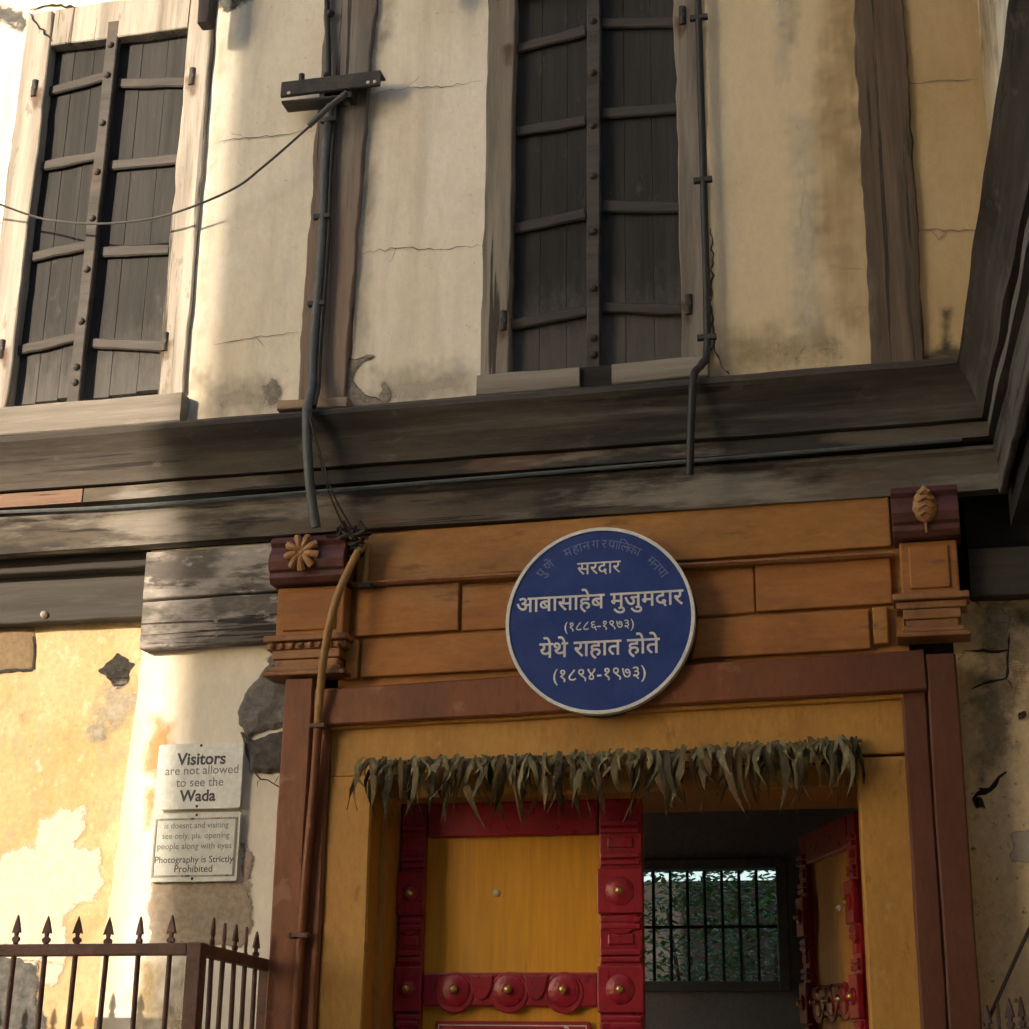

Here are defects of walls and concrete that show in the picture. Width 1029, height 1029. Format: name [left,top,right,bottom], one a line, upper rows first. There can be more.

crack [359,245,481,260]
crack [919,228,975,240]
peeling [346,355,392,406]
flaking render [98,653,134,689]
crack [964,634,1013,689]
flaking render [238,656,286,774]
water stain [146,722,169,771]
crack [972,771,1007,800]
peeling [0,806,104,944]
peeling [6,957,66,987]